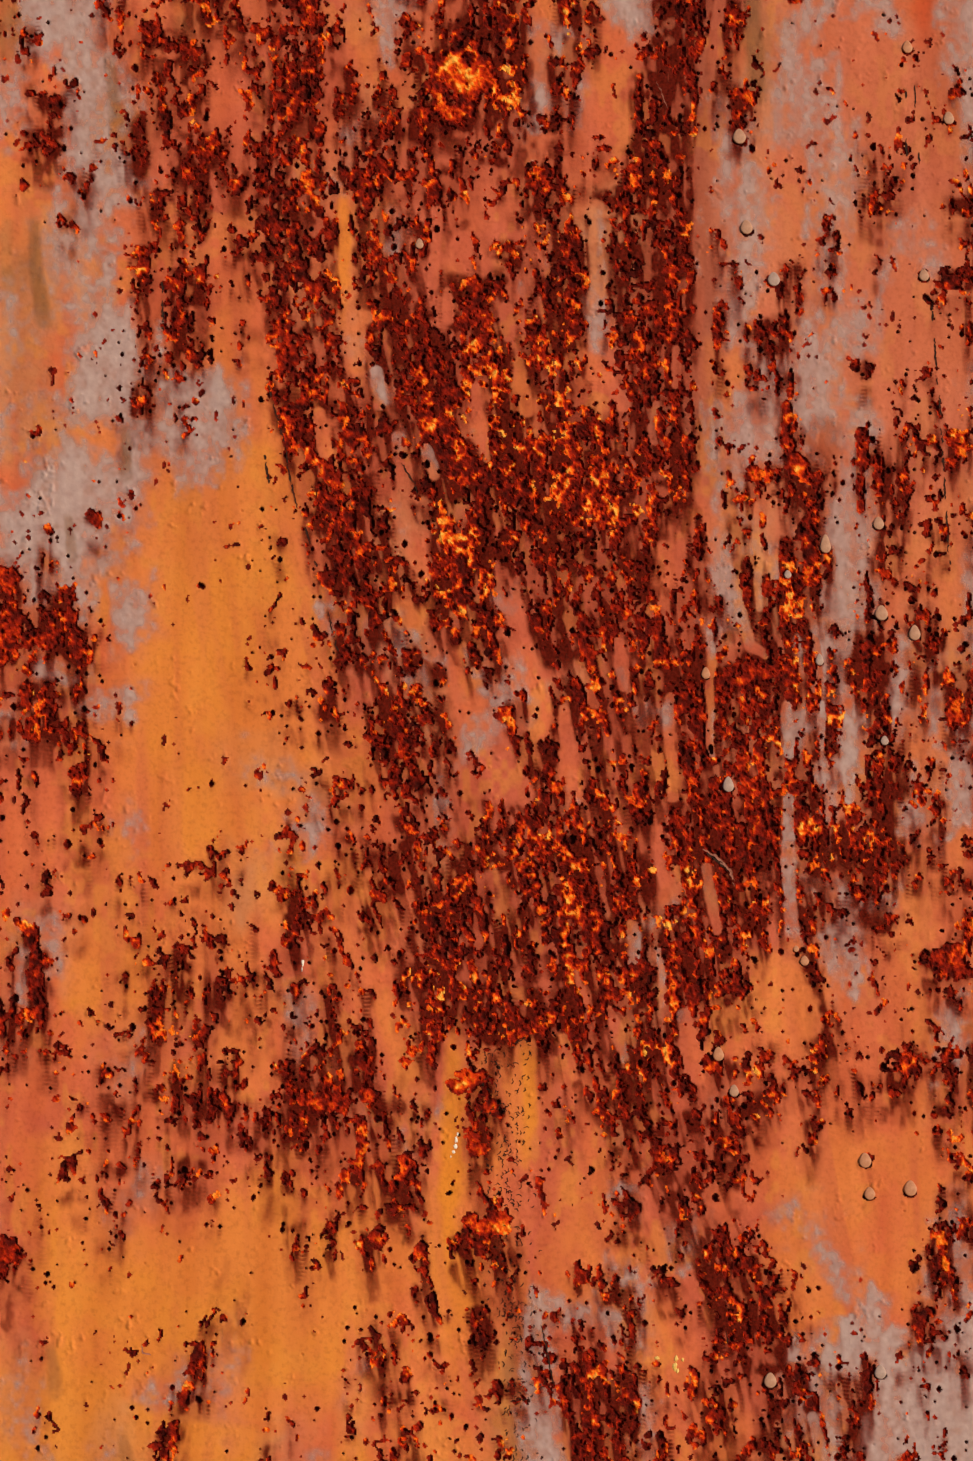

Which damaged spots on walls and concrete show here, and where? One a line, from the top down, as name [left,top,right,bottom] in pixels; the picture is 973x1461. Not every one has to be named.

corrosion [765,149,823,202]
corrosion [813,64,973,359]
corrosion [117,489,142,533]
corrosion [258,524,289,627]
corrosion [244,635,293,690]
corrosion [162,830,263,911]
corrosion [506,1156,560,1230]
corrosion [32,1405,60,1452]
corrosion [90,1300,250,1461]
corrosion [258,1383,321,1461]
corrosion [341,1368,362,1443]
corrosion [448,1424,514,1461]